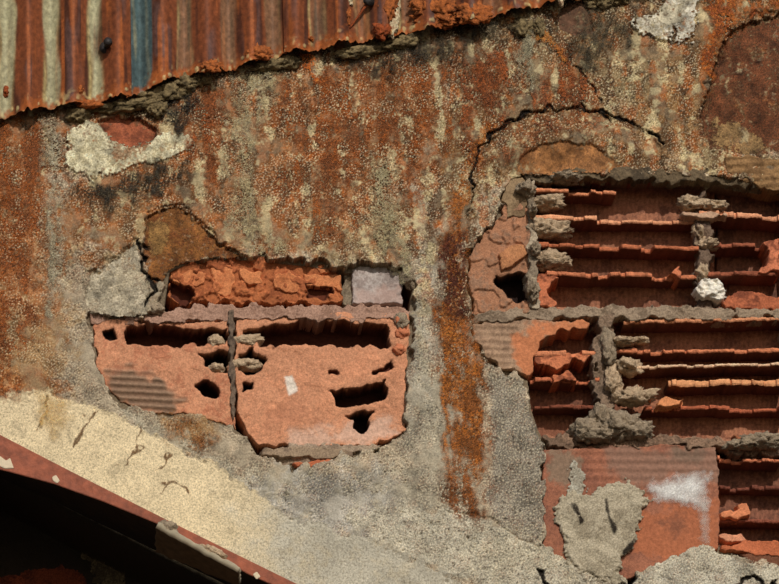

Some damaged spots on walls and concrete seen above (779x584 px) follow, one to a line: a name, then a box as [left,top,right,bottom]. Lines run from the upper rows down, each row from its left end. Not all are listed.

rust [199,59,223,73]
rust [245,42,274,61]
rust [372,0,494,42]
rust [701,0,779,96]
rust [186,84,230,183]
crack [468,66,664,197]
rust [0,118,60,398]
spalling [84,206,416,469]
rust [274,30,609,521]
spalling [467,12,779,583]
efflorescence [651,476,705,507]
crack [740,575,776,584]